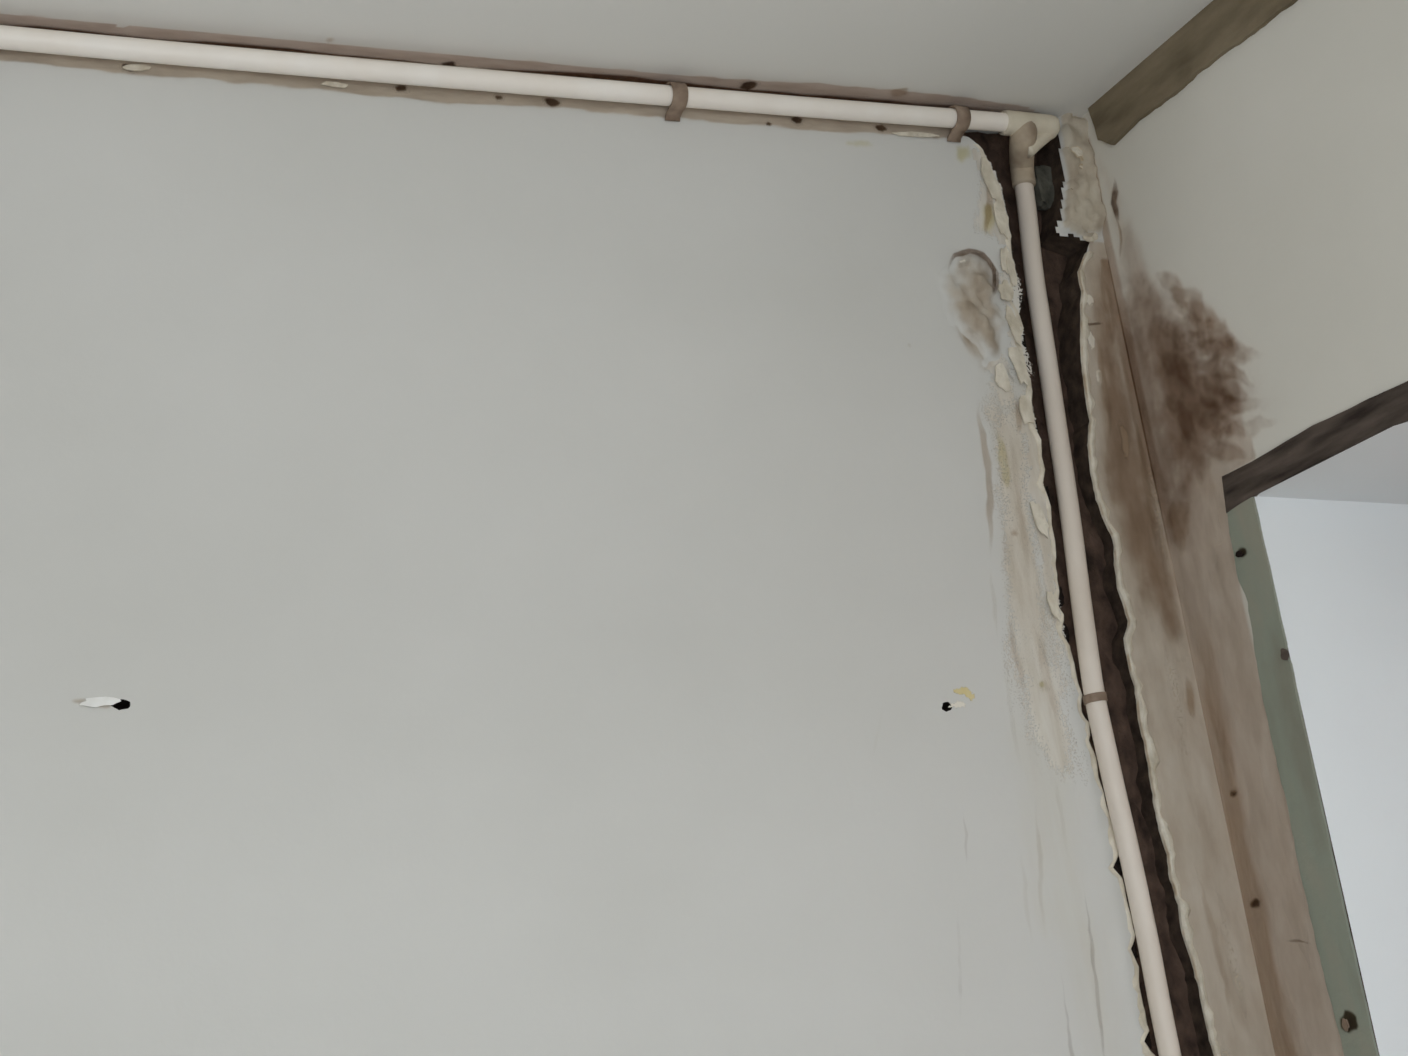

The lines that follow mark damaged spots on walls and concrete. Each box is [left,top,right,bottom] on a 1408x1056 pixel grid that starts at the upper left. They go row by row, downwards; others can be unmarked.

peeling [972,146,1088,786]